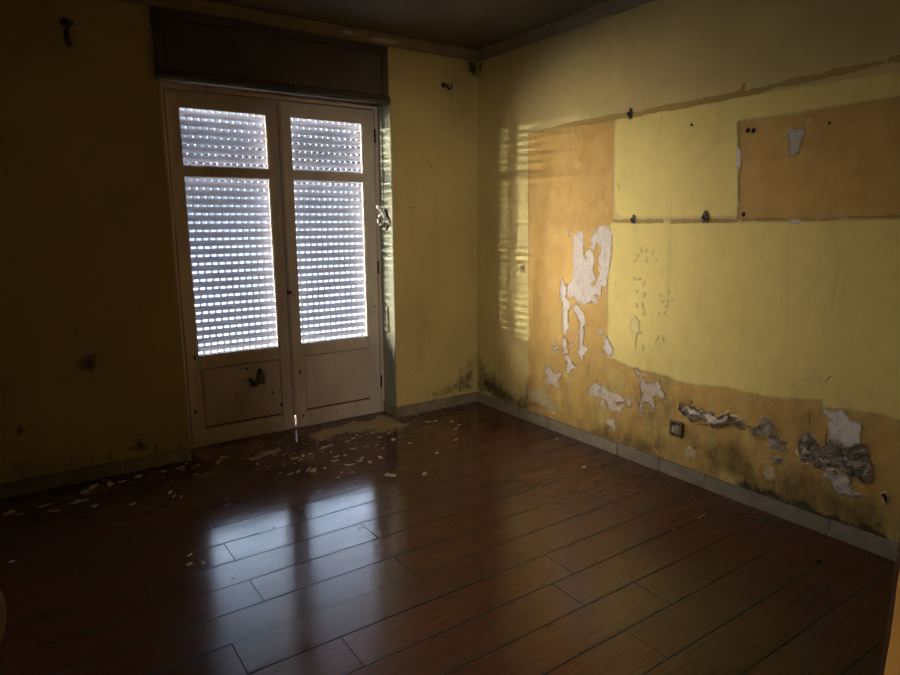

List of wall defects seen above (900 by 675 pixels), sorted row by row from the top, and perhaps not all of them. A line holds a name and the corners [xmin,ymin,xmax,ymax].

peeling [784,117,810,157]
peeling [531,225,614,414]
peeling [587,367,668,432]
flaking render [677,402,876,498]
leakage [740,474,886,539]